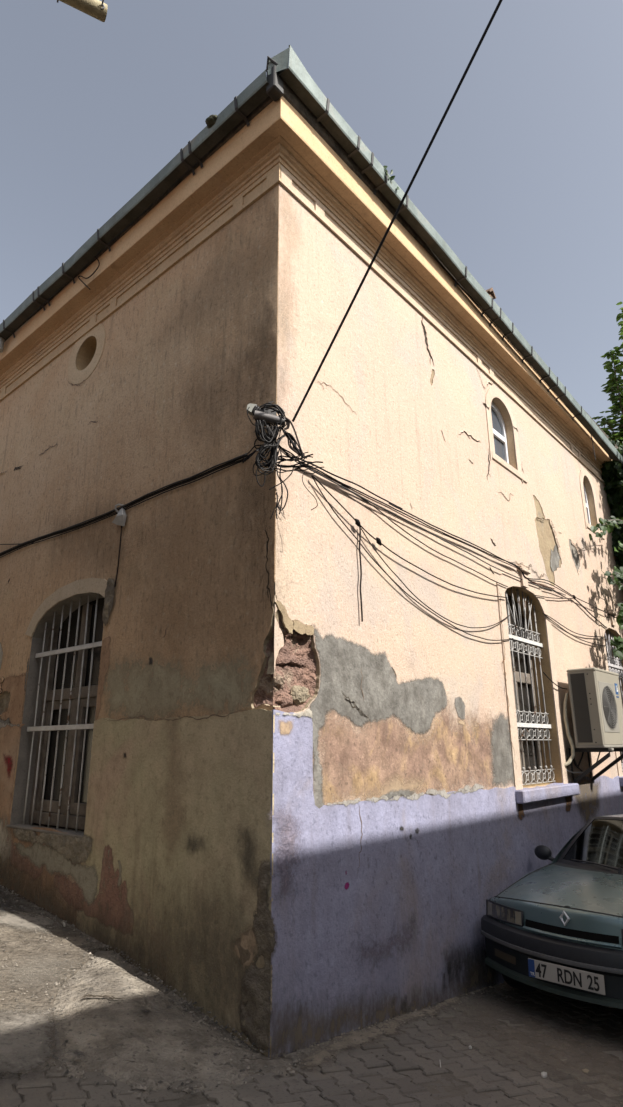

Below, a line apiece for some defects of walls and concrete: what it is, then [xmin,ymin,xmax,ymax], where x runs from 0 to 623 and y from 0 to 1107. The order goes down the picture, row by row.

crack [422,317,435,366]
crack [441,430,524,501]
crack [265,528,273,611]
spalling [533,495,582,585]
peeling [0,674,26,724]
peeling [251,590,493,806]
peeling [54,845,134,935]
damp [272,966,493,1056]